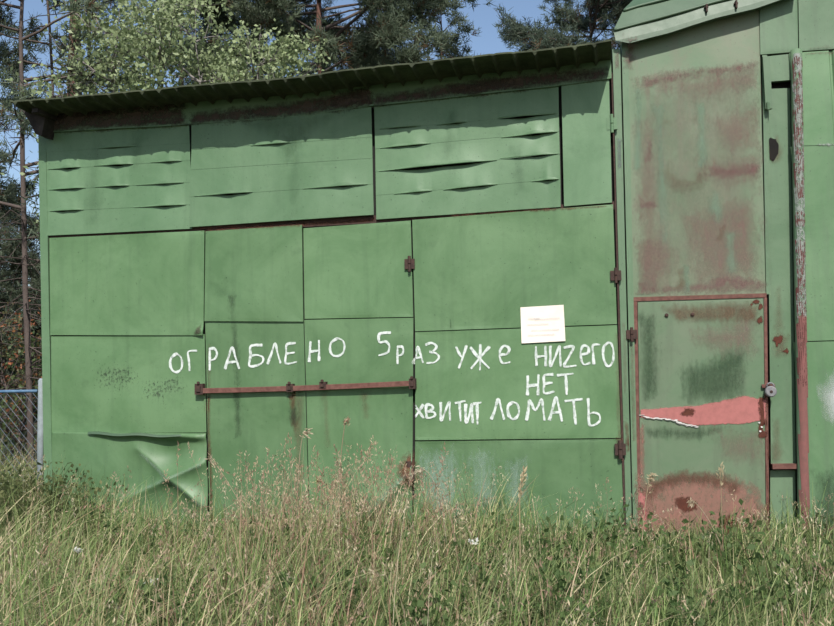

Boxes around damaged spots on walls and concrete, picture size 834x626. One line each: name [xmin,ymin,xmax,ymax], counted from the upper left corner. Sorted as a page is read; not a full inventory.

corrosion [675,497,697,512]
peeling [635,396,767,537]